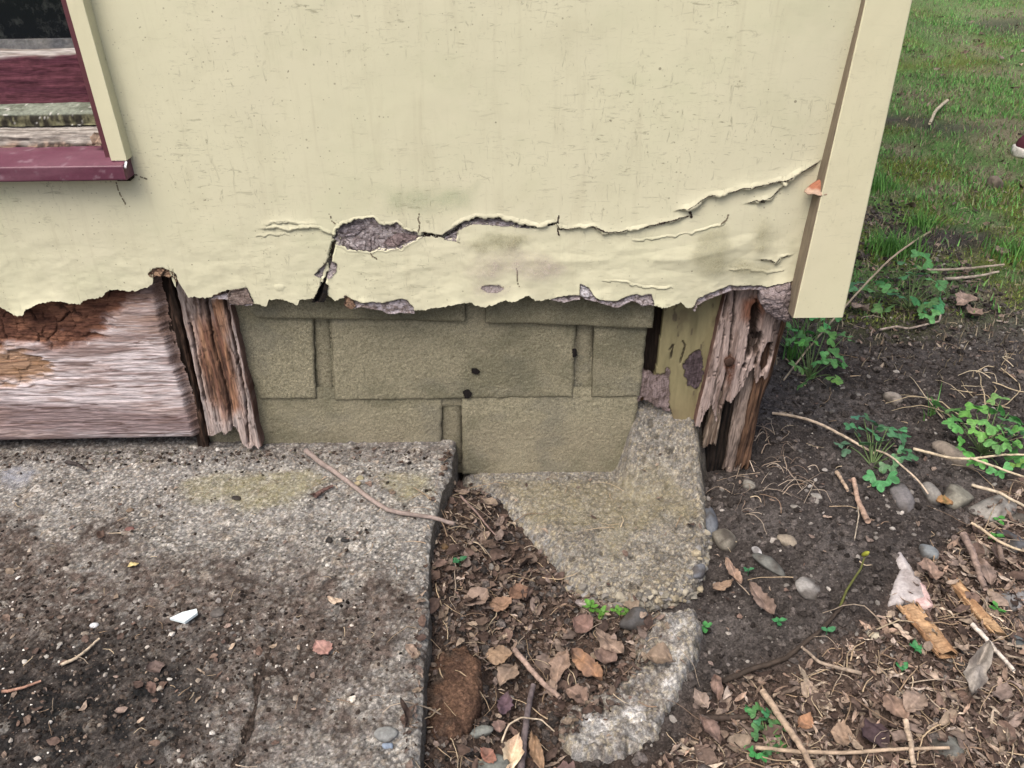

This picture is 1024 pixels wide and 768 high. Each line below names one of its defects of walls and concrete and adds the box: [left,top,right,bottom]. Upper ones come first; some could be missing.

spalling [331,215,423,255]
crack [312,216,337,303]
peeling [148,268,177,282]
peeling [210,288,253,306]
peeling [344,295,415,314]
peeling [481,285,504,293]
peeling [551,284,654,308]
spalling [693,282,793,322]
peeling [637,350,704,412]